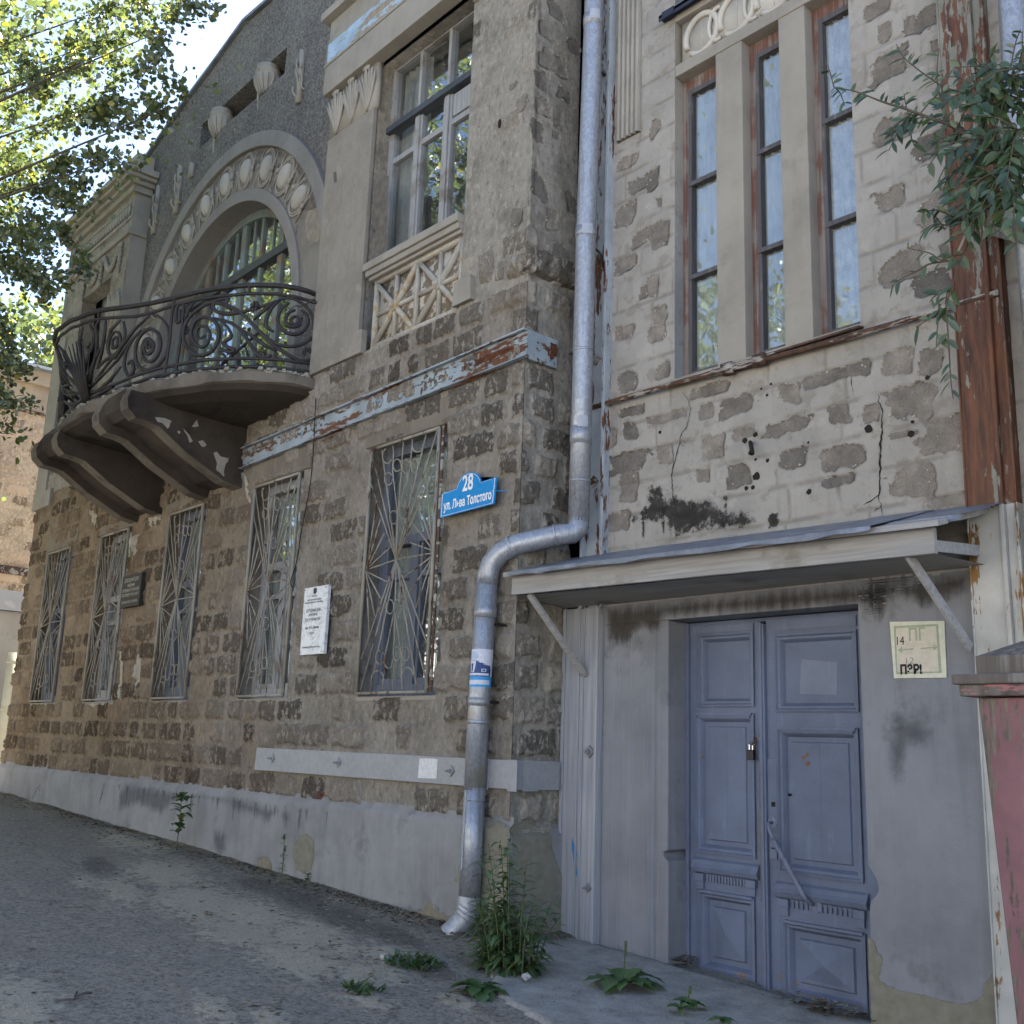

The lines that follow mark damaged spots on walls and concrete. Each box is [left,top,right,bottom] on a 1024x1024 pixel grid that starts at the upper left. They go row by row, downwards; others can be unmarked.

peeling [155,417,229,476]
crack [671,392,691,500]
spalling [609,345,966,532]
crack [848,376,883,516]
leakage [632,485,754,537]